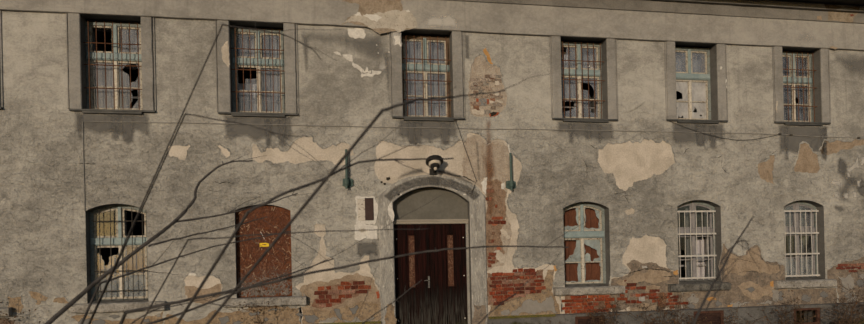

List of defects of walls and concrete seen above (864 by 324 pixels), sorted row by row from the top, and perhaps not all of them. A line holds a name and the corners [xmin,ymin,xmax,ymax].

flaking render [342,0,418,54]
peeling [334,51,381,77]
flaking render [467,48,508,118]
flaking render [249,134,355,166]
flaking render [372,131,864,324]
flaking render [70,221,397,324]